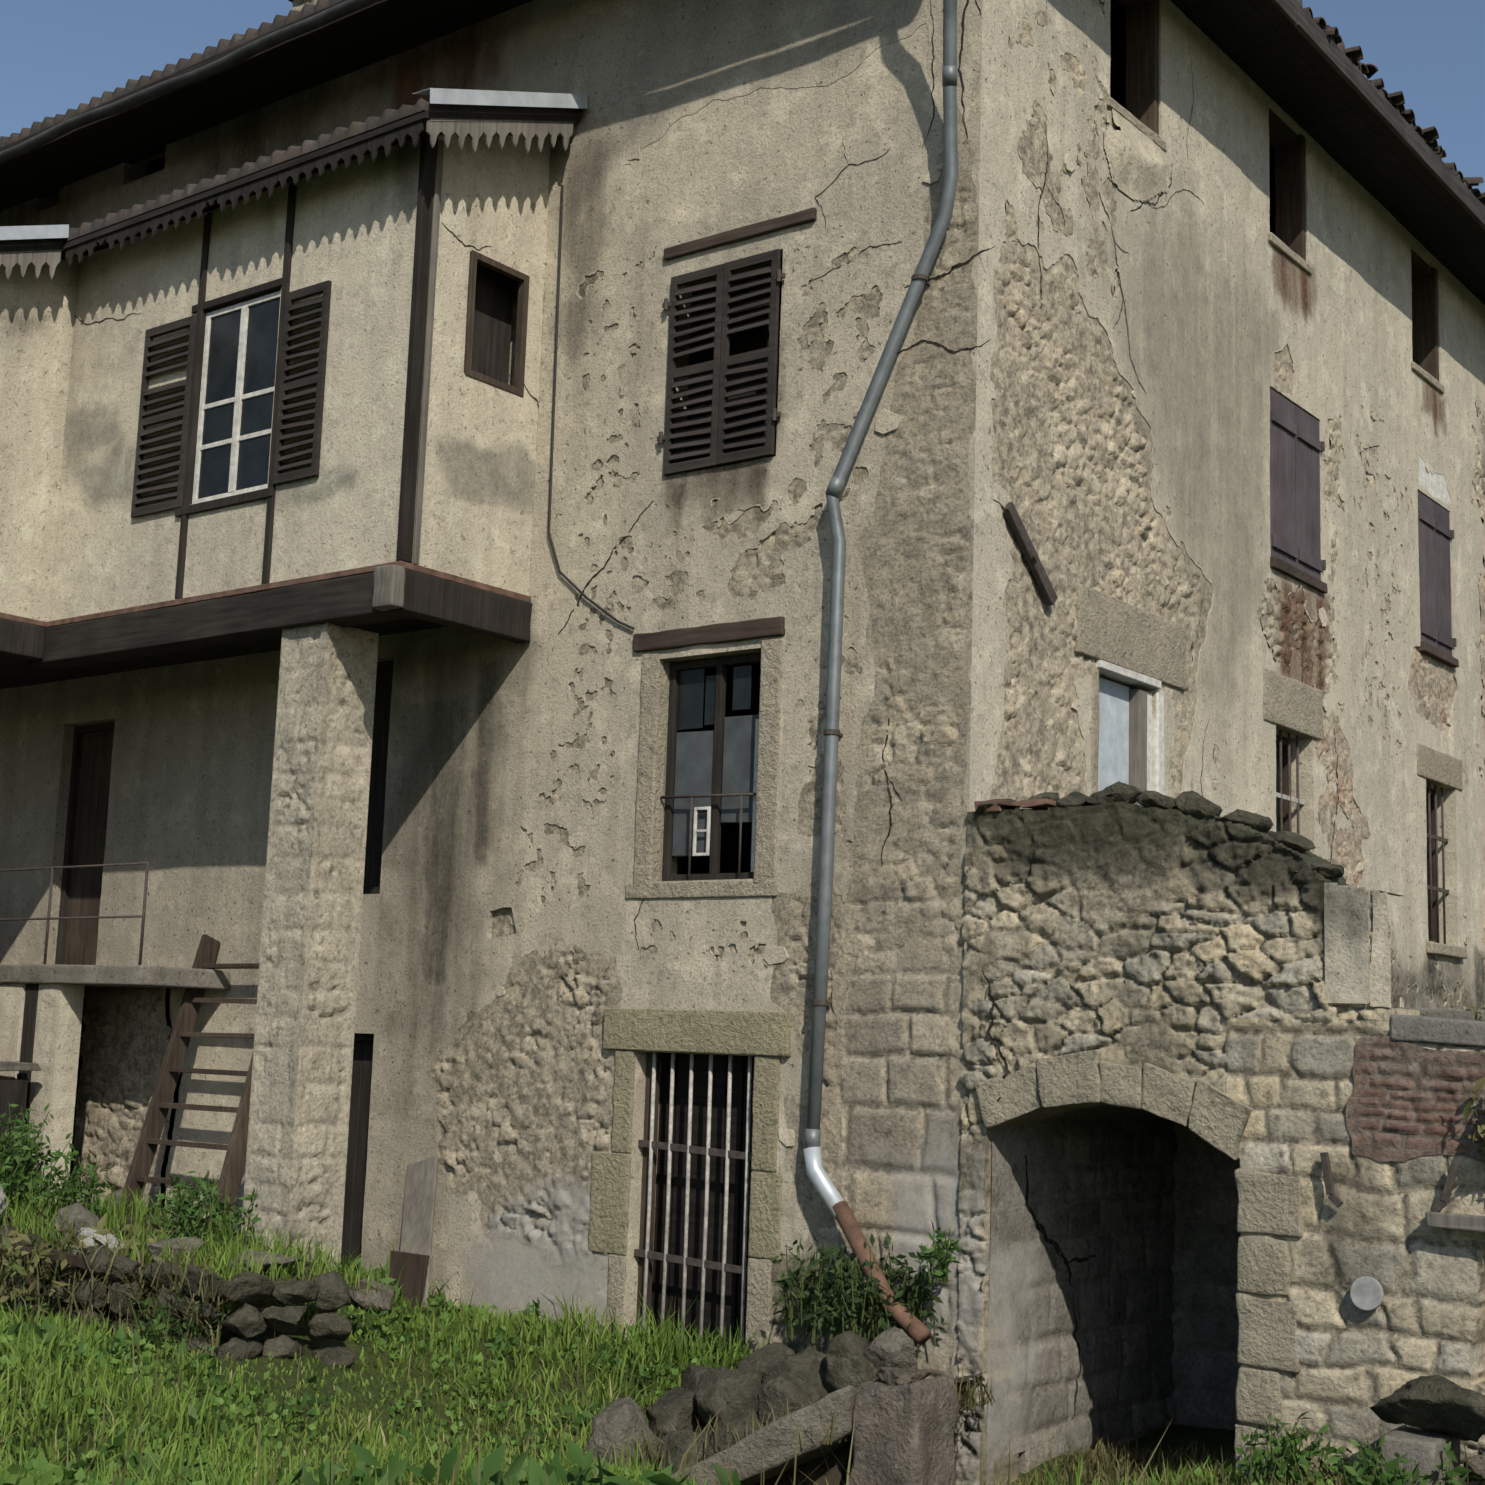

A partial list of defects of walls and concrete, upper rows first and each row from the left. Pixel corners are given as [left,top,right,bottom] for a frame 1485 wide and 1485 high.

flaking render [582,300,641,505]
flaking render [621,23,930,222]
crack [815,0,981,227]
crack [897,339,991,354]
crack [904,246,995,288]
crack [1038,134,1066,308]
crack [1099,192,1147,394]
flaking render [516,531,705,904]
flaking render [703,48,1213,1379]
flaking render [1257,416,1456,888]
flaking render [427,936,622,1271]
crack [1024,1155,1096,1420]